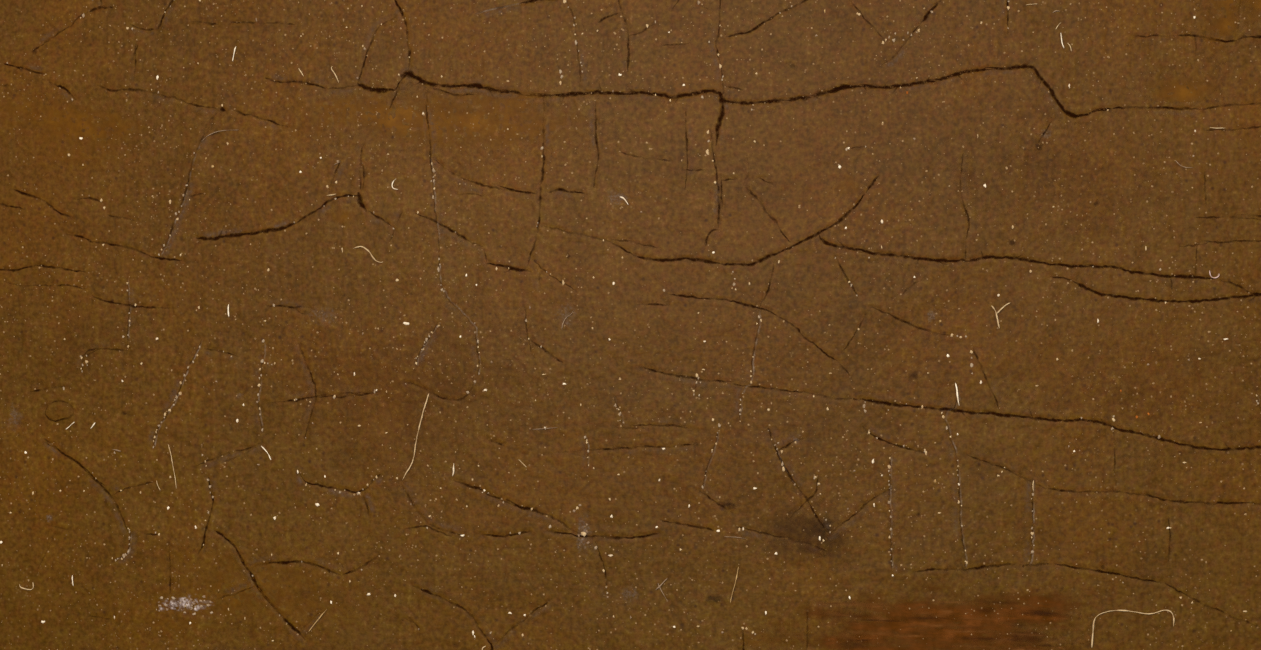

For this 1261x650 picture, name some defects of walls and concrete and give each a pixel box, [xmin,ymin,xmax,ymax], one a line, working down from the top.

crack [5,47,73,101]
crack [64,0,171,93]
crack [10,190,116,246]
crack [155,150,465,292]
crack [0,265,155,348]
crack [358,0,1261,610]
crack [35,349,147,494]
crack [153,339,376,449]
crack [112,528,160,561]
crack [201,454,379,633]